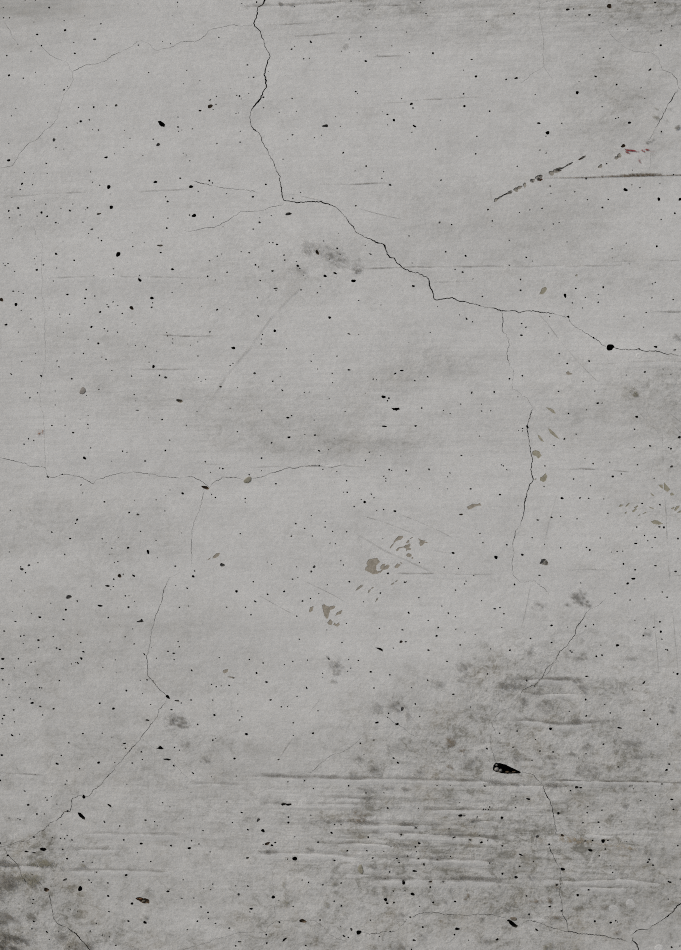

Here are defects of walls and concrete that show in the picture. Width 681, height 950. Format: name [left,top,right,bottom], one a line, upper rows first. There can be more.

crack [154,0,678,594]
crack [2,272,340,950]
crack [183,772,681,950]